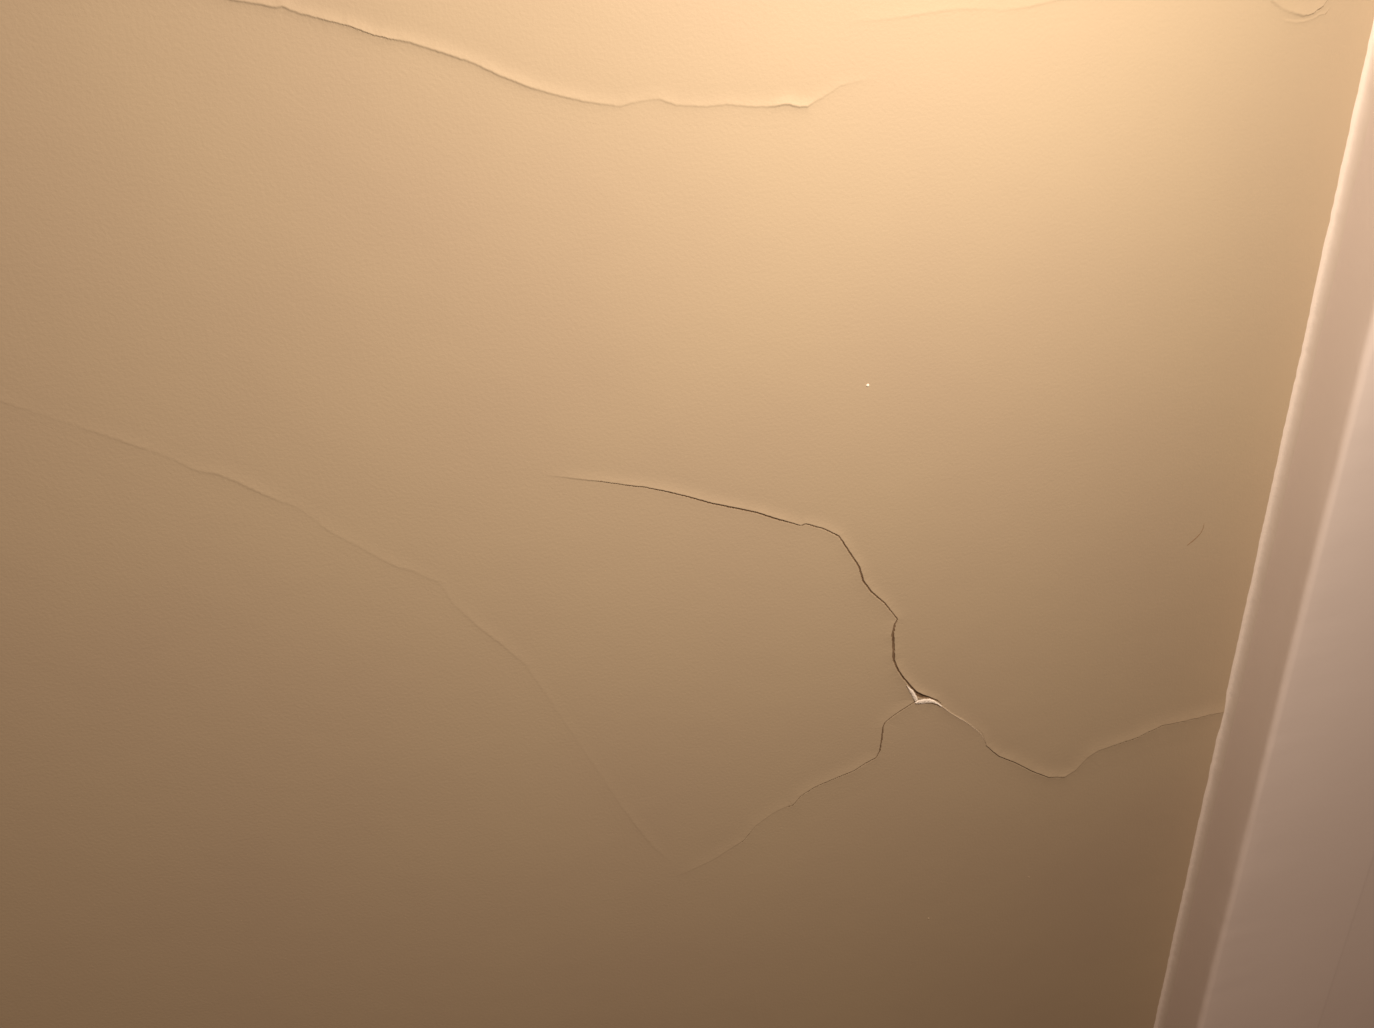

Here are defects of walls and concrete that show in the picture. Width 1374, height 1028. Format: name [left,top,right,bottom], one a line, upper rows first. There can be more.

crack [543,465,1226,886]